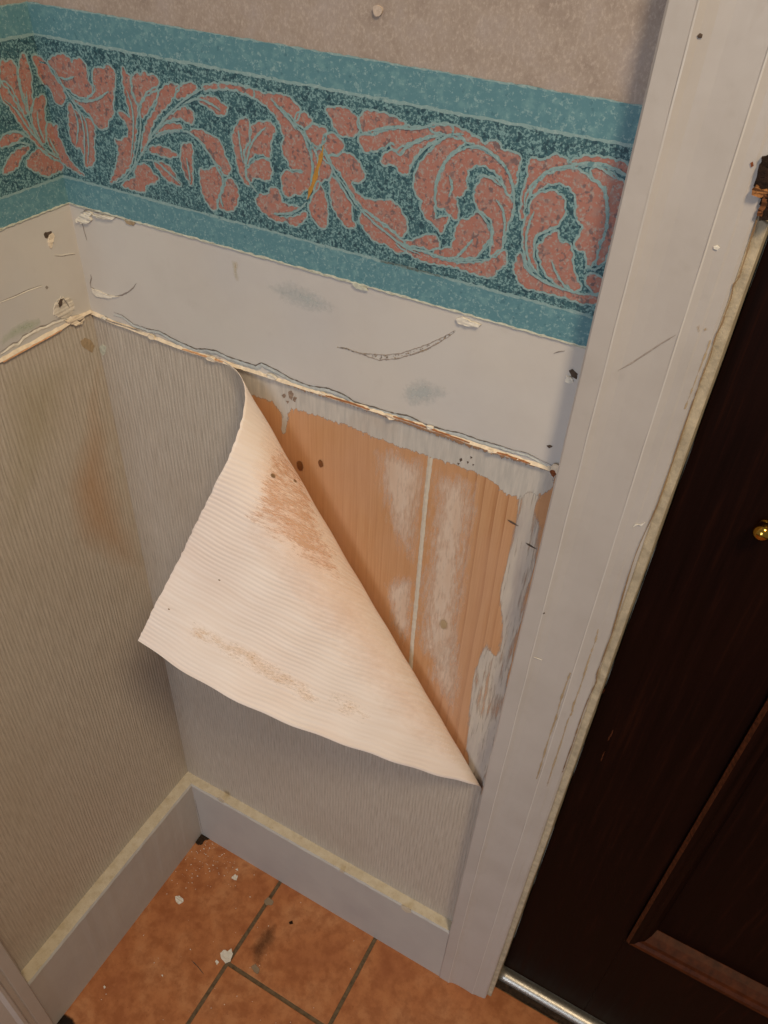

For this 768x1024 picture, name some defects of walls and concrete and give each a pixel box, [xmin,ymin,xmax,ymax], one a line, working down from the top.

peeling [44,231,55,249]
crack [0,277,552,471]
peeling [138,355,556,794]